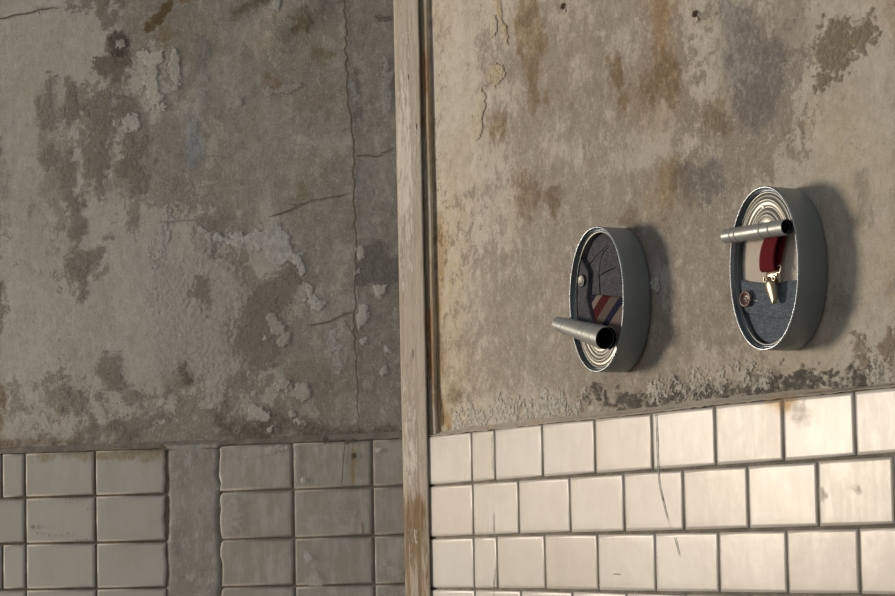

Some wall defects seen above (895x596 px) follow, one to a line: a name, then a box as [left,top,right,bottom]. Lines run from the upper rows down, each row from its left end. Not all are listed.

crack [0,7,59,20]
peeling [805,7,881,97]
peeling [33,45,182,301]
peeling [213,223,326,312]
crack [270,0,392,487]
peeling [247,390,273,433]
peeling [263,312,292,348]
peeling [271,378,311,403]
leakage [452,353,895,443]
peeling [849,317,895,377]